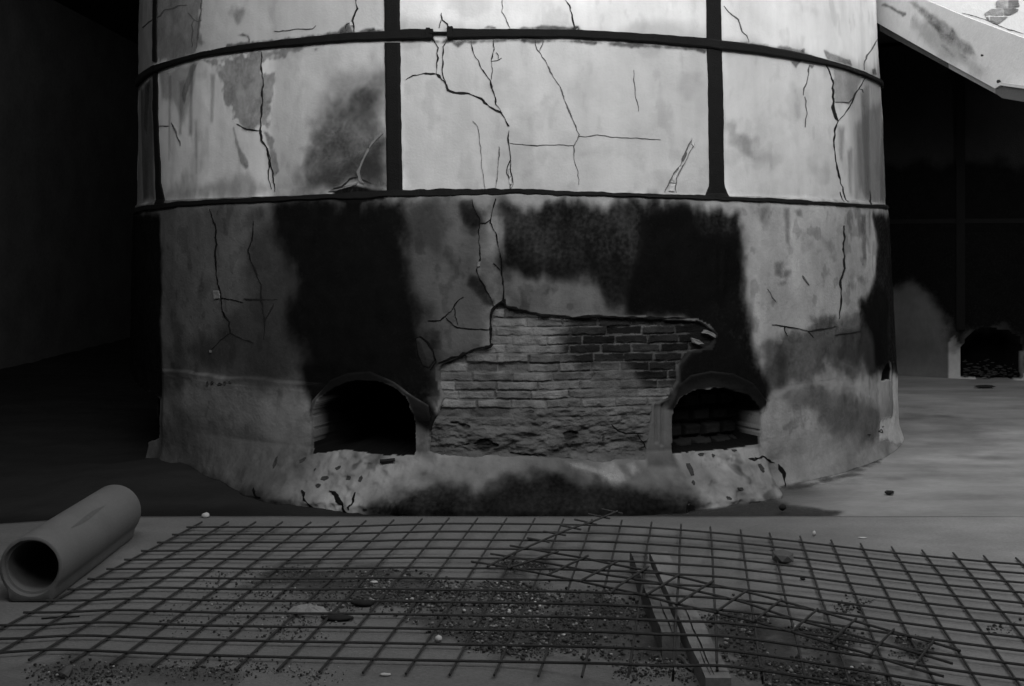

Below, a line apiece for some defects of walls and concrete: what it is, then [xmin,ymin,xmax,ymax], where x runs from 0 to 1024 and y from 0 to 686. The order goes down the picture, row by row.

crack [237,52,275,192]
leakage [306,89,385,188]
crack [406,4,683,363]
crack [665,138,695,193]
crack [768,39,878,338]
crack [209,209,276,353]
spalling [430,303,716,463]